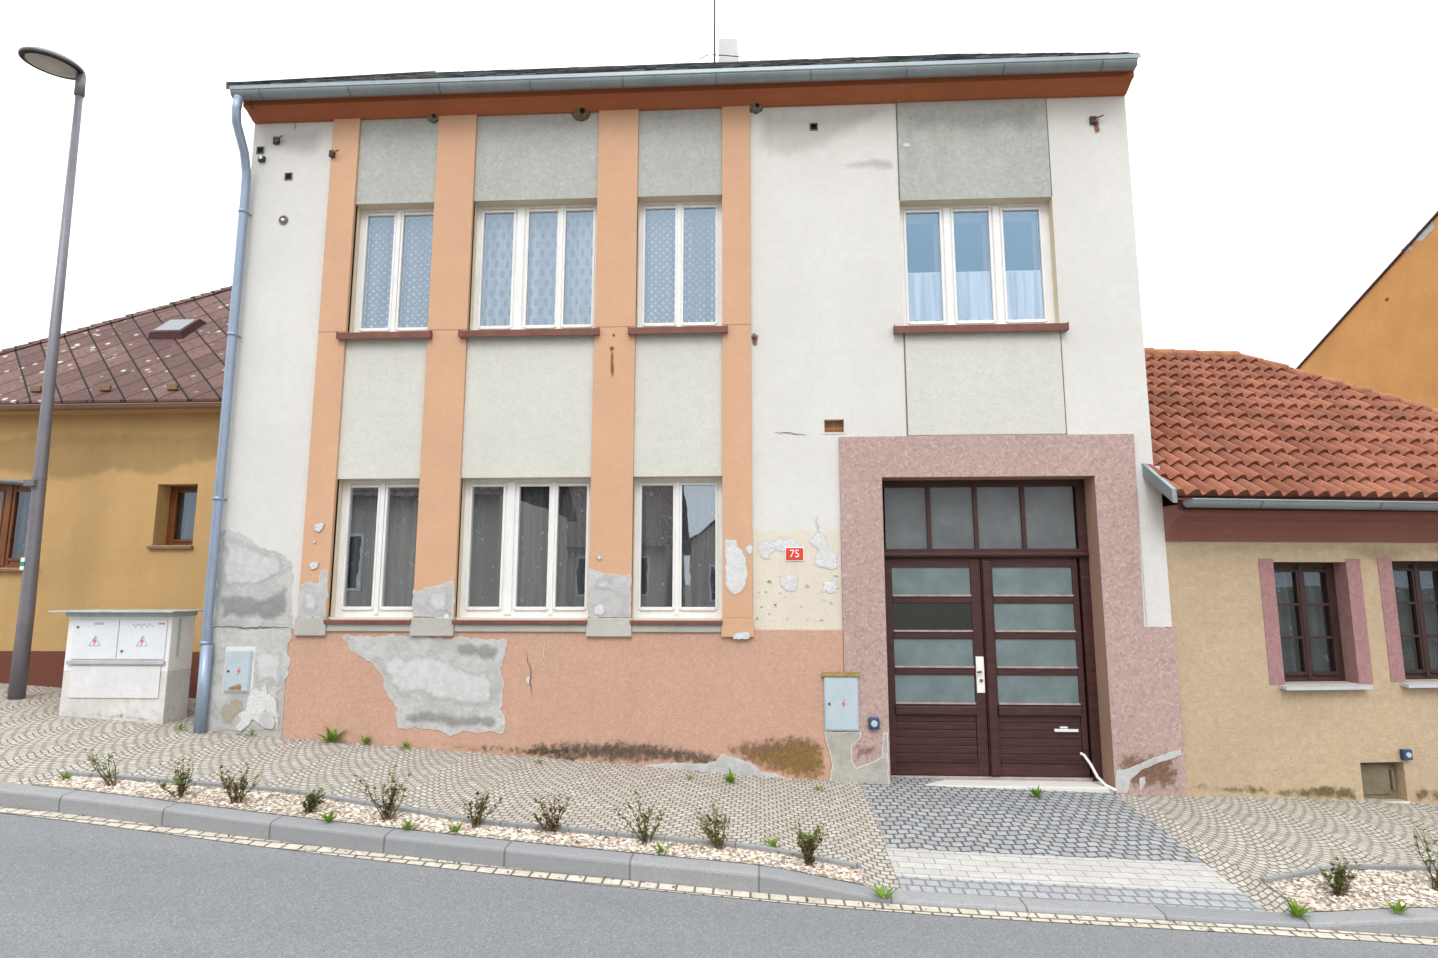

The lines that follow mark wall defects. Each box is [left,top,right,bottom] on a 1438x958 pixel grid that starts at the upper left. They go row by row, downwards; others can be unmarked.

peeling [206,529,329,732]
peeling [412,578,455,618]
peeling [586,556,632,618]
peeling [725,532,839,640]
peeling [342,633,507,736]